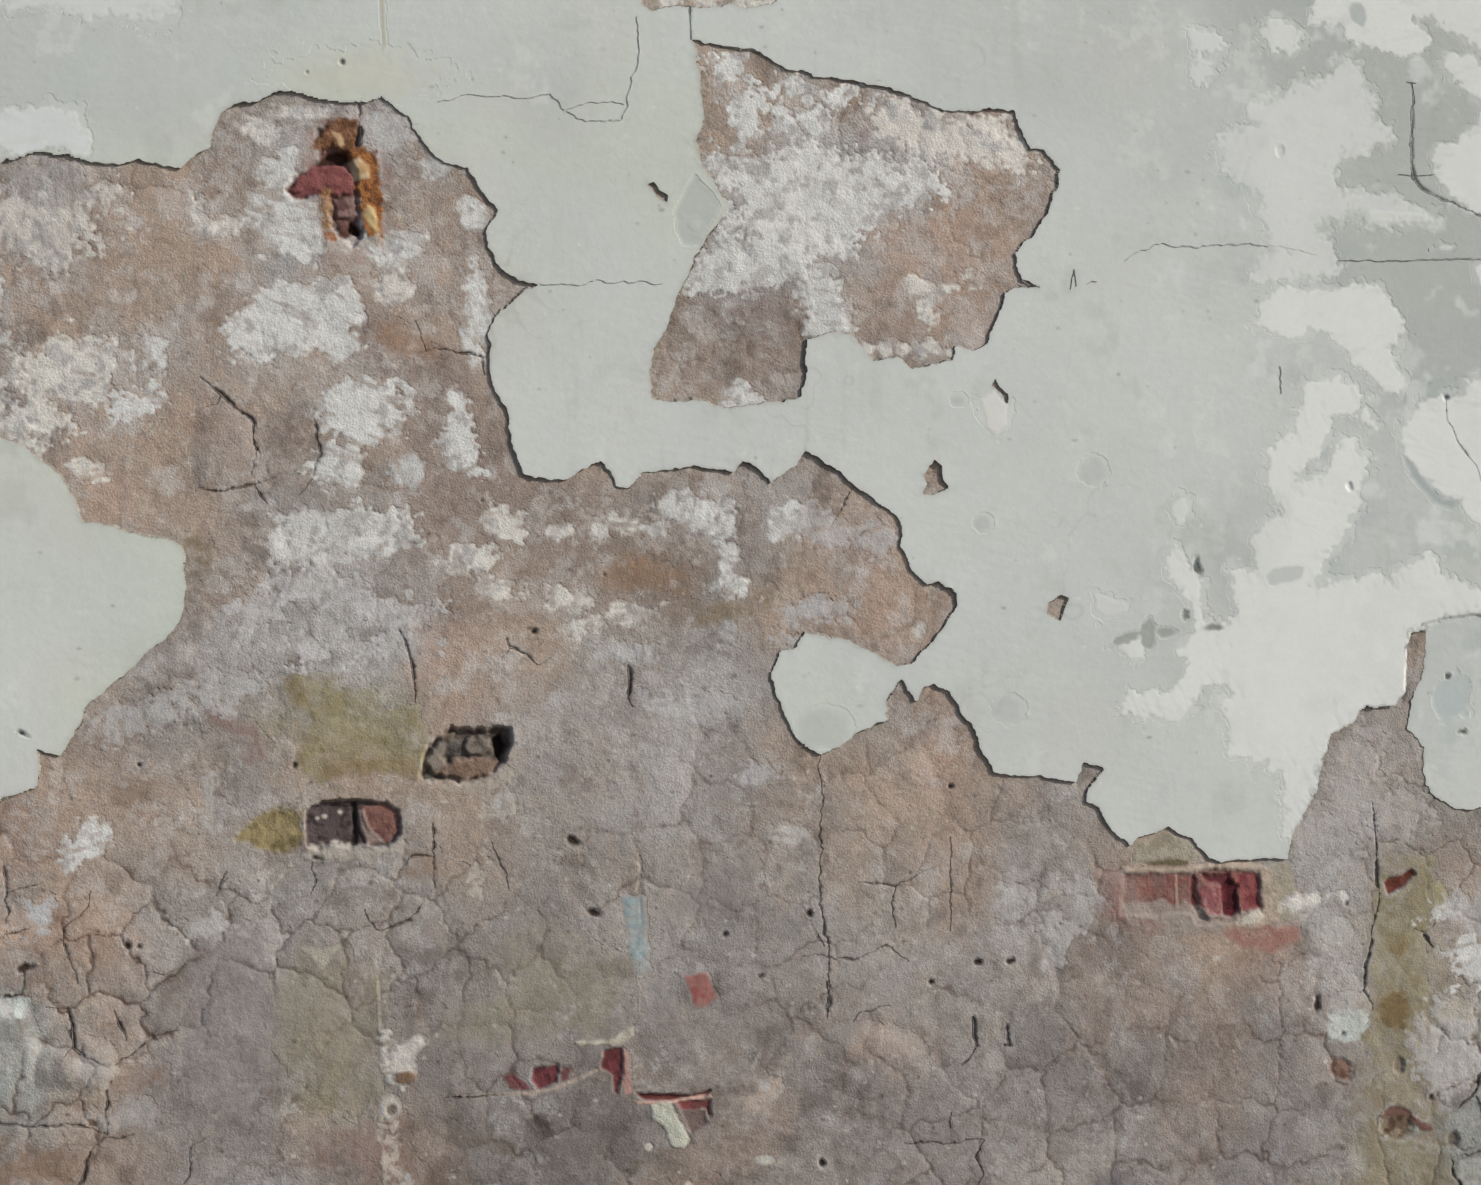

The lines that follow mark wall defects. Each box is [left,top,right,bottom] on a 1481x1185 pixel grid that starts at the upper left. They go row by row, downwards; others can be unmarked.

peeling [648,40,1060,408]
peeling [1209,0,1481,402]
crack [1399,82,1481,216]
leakage [350,313,450,371]
leakage [182,521,219,598]
spalling [426,724,514,784]
peeling [590,634,663,672]
leakage [593,546,783,630]
peeling [1103,367,1481,900]
crack [0,866,178,1185]
crack [803,759,953,1020]
crack [1363,806,1380,1026]